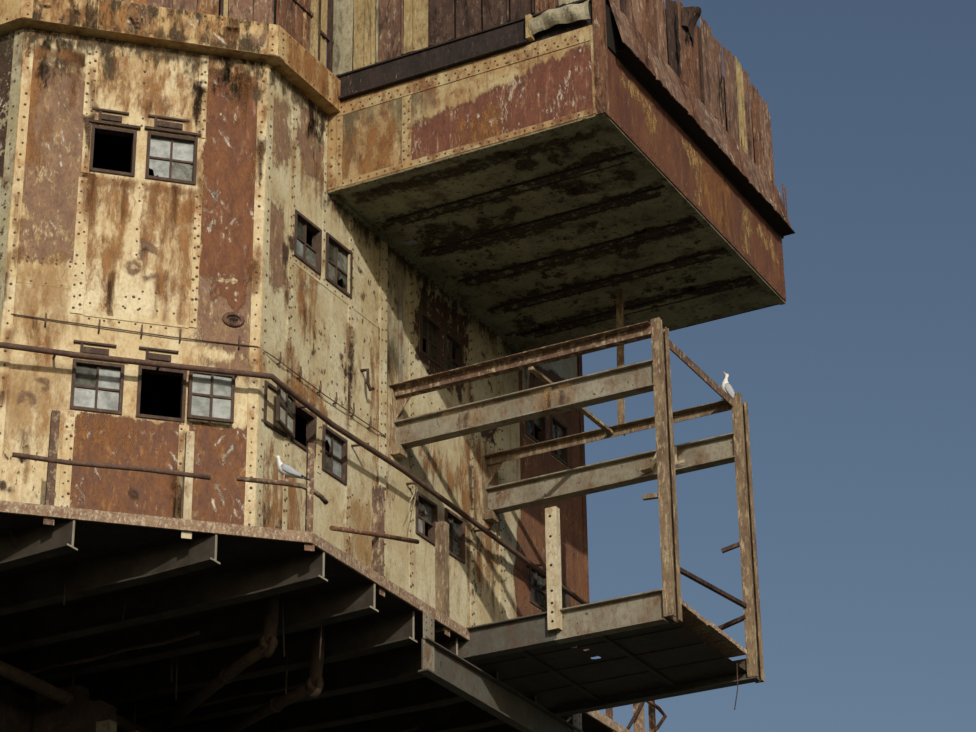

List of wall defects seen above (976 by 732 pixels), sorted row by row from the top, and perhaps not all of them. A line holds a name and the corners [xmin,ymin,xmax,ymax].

peeling [0,39,21,178]
rust [342,43,593,182]
rust [0,0,408,499]
peeling [414,285,469,375]
rust [171,469,183,514]